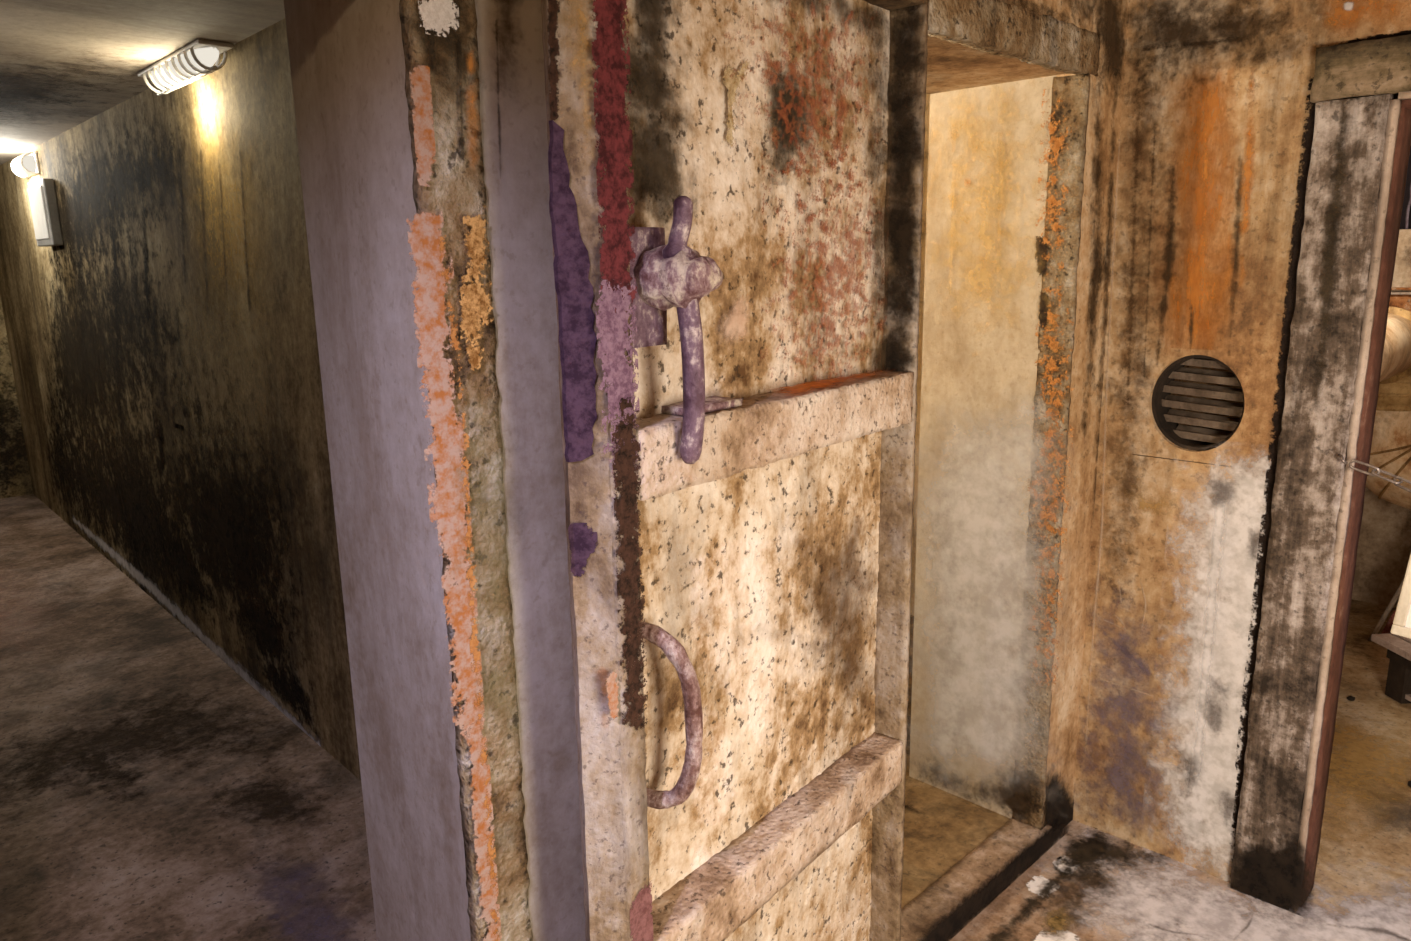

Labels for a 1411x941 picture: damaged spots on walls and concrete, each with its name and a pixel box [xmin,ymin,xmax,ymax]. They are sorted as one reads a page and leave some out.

leakage [0,117,320,803]
leakage [233,781,325,822]
peeling [418,0,459,37]
corrosion [439,235,499,941]
corrosion [724,1,889,394]
leakage [918,426,1153,941]
corrosion [1027,89,1075,694]
leakage [1006,0,1289,490]
leakage [1086,457,1313,916]
leakage [1314,108,1349,402]